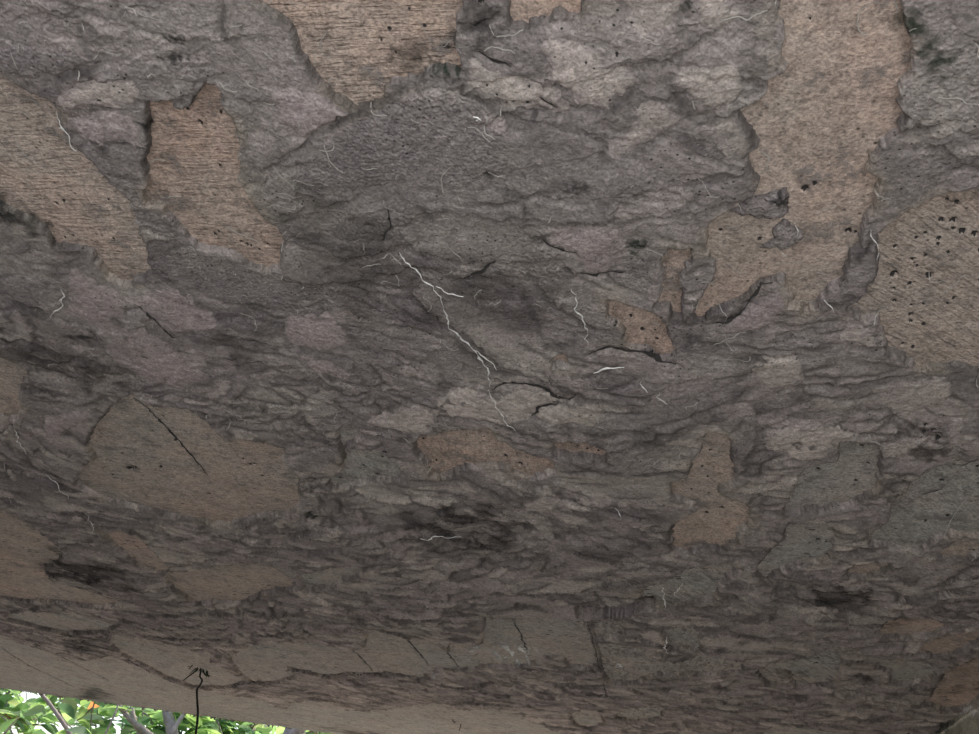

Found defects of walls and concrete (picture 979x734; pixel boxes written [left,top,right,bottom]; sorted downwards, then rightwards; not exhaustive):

peeling [263,0,463,105]
peeling [0,75,151,280]
peeling [147,82,285,266]
peeling [695,0,912,316]
peeling [848,187,979,377]
crack [133,397,208,476]
peeling [77,394,300,521]
peeling [671,432,749,549]
peeling [0,508,118,605]
peeling [108,531,361,602]
peeling [0,612,742,734]
crack [407,640,459,667]